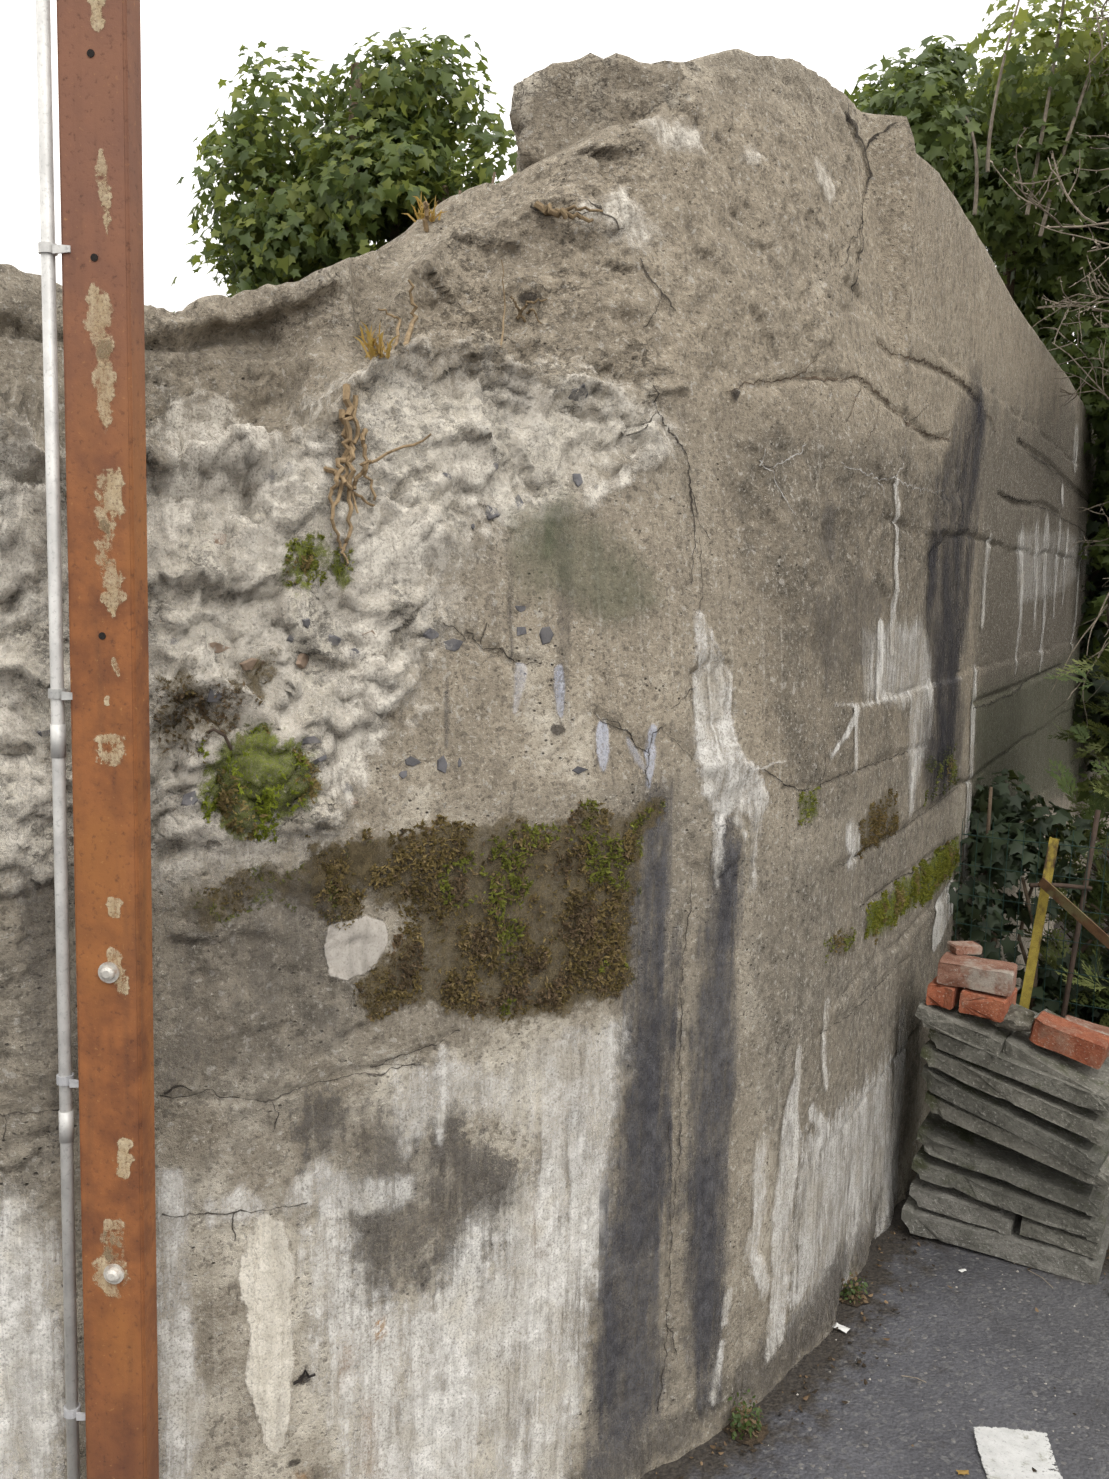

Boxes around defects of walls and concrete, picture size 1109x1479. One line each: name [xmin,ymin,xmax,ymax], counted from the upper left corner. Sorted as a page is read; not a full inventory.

crack [841,94,898,299]
crack [621,385,710,617]
crack [726,341,1091,539]
damp [910,373,991,950]
damp [1020,517,1094,671]
damp [585,613,907,1479]
damp [320,1099,524,1320]